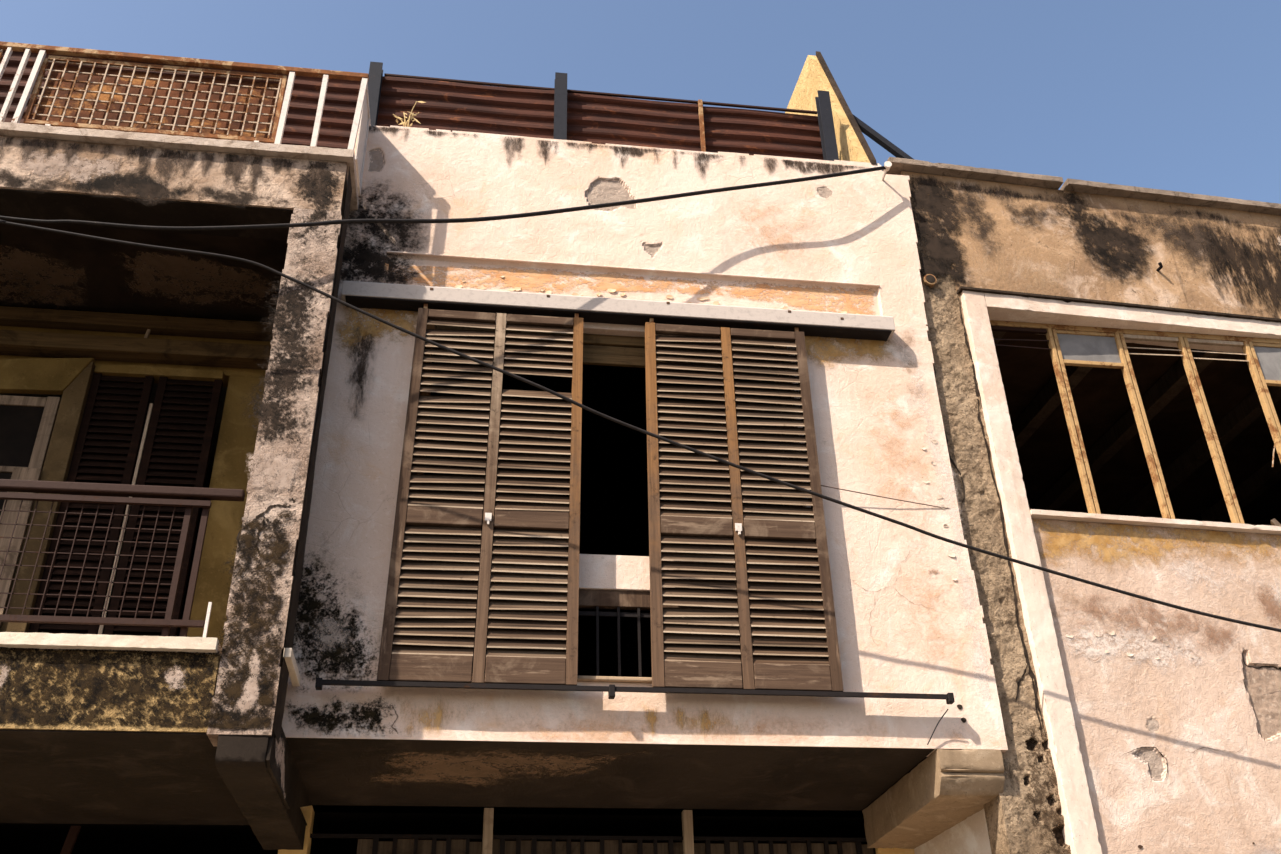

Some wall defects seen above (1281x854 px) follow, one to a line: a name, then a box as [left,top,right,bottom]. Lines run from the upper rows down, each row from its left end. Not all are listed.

damp [504,138,557,162]
flaking render [585,178,636,211]
damp [695,153,708,174]
damp [909,178,995,290]
damp [1007,192,1281,318]
damp [0,137,422,744]
crack [944,299,1047,739]
flaking render [1242,649,1281,741]
flaking render [1122,718,1168,782]